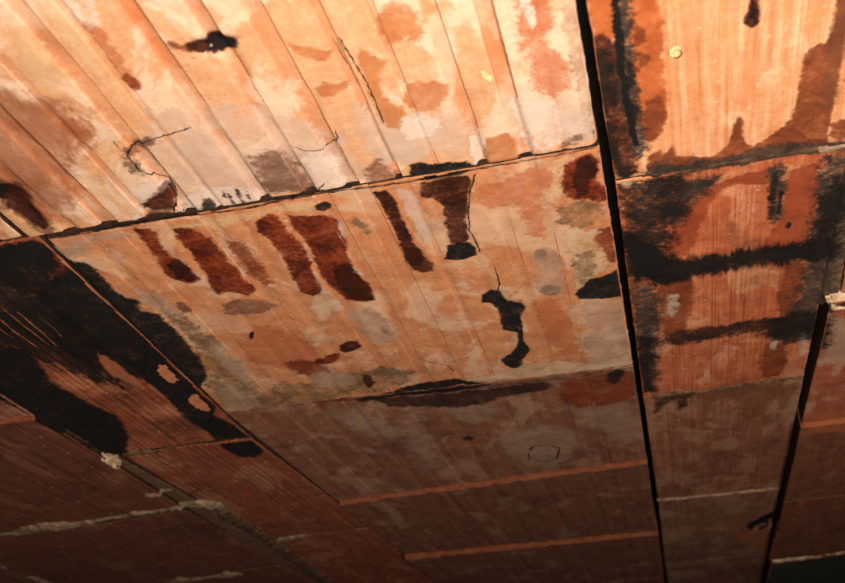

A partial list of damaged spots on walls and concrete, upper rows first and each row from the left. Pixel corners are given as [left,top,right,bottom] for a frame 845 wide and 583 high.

leakage [0,27,91,221]
rust [134,228,273,296]
leakage [140,103,487,229]
rust [256,202,374,302]
crack [46,127,597,252]
rust [373,190,434,273]
leakage [397,189,433,241]
rust [421,176,476,260]
leakage [483,0,596,237]
leakage [588,0,845,393]
leakage [0,200,642,471]
crack [500,424,582,468]